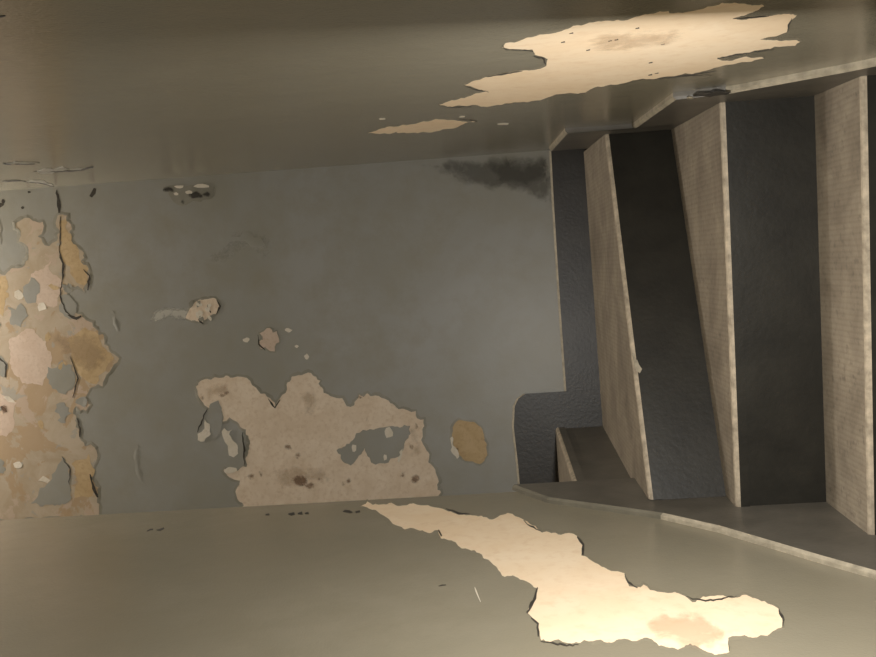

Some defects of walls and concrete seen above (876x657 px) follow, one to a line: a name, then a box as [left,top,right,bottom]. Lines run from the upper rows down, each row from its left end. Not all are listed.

peeling [367,1,803,135]
peeling [0,206,122,520]
crack [56,190,81,320]
peeling [153,296,221,325]
spalling [163,184,214,206]
peeling [243,327,292,353]
peeling [194,345,785,657]